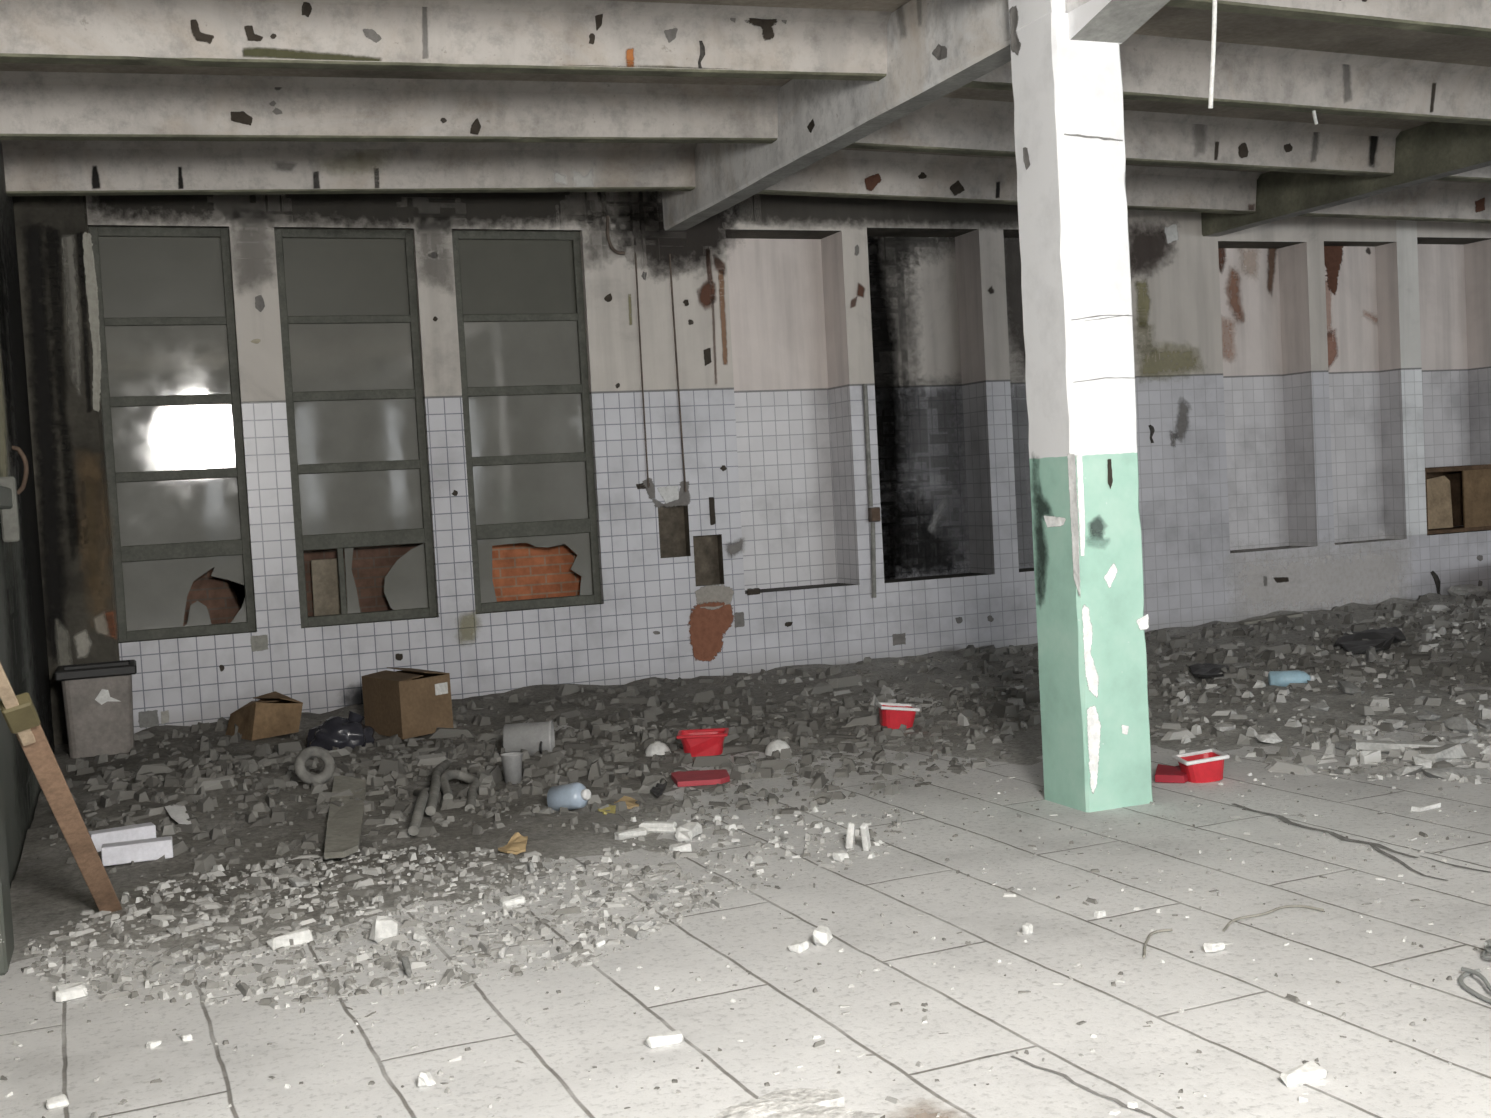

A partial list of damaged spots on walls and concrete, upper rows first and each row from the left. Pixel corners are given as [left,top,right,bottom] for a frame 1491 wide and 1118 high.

rust [1218,248,1277,358]
rust [1324,246,1344,367]
spalling [688,584,760,661]
peeling [892,633,906,646]